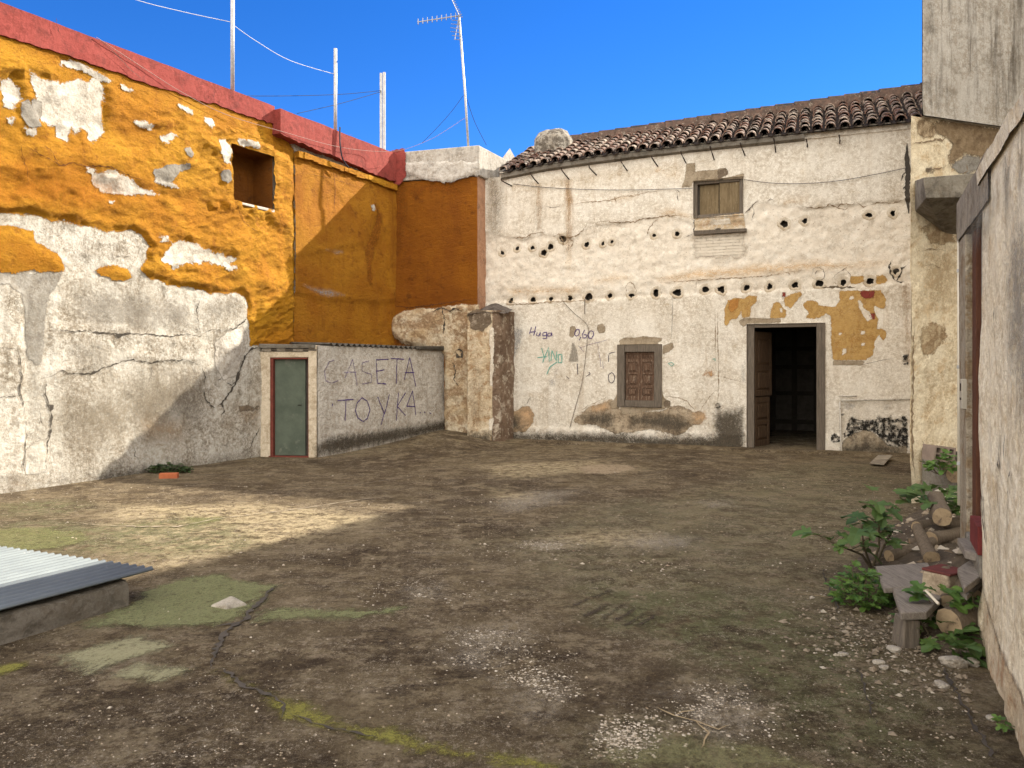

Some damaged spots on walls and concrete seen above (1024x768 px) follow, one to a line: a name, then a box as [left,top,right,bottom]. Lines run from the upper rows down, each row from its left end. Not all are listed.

peeling [0,60,135,144]
peeling [86,147,194,204]
crack [514,190,695,248]
peeling [0,225,65,274]
peeling [96,265,131,281]
peeling [160,235,238,271]
peeling [724,275,887,365]
crack [0,302,258,469]
spalling [513,406,534,432]
spalling [574,392,705,436]